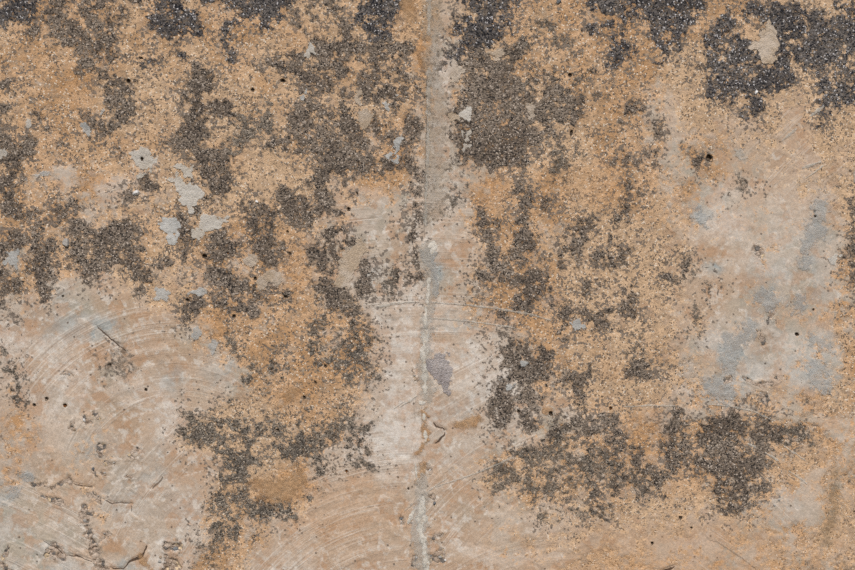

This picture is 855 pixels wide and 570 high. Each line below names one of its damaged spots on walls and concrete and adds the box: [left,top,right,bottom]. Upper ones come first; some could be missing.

spalling [78,491,112,570]